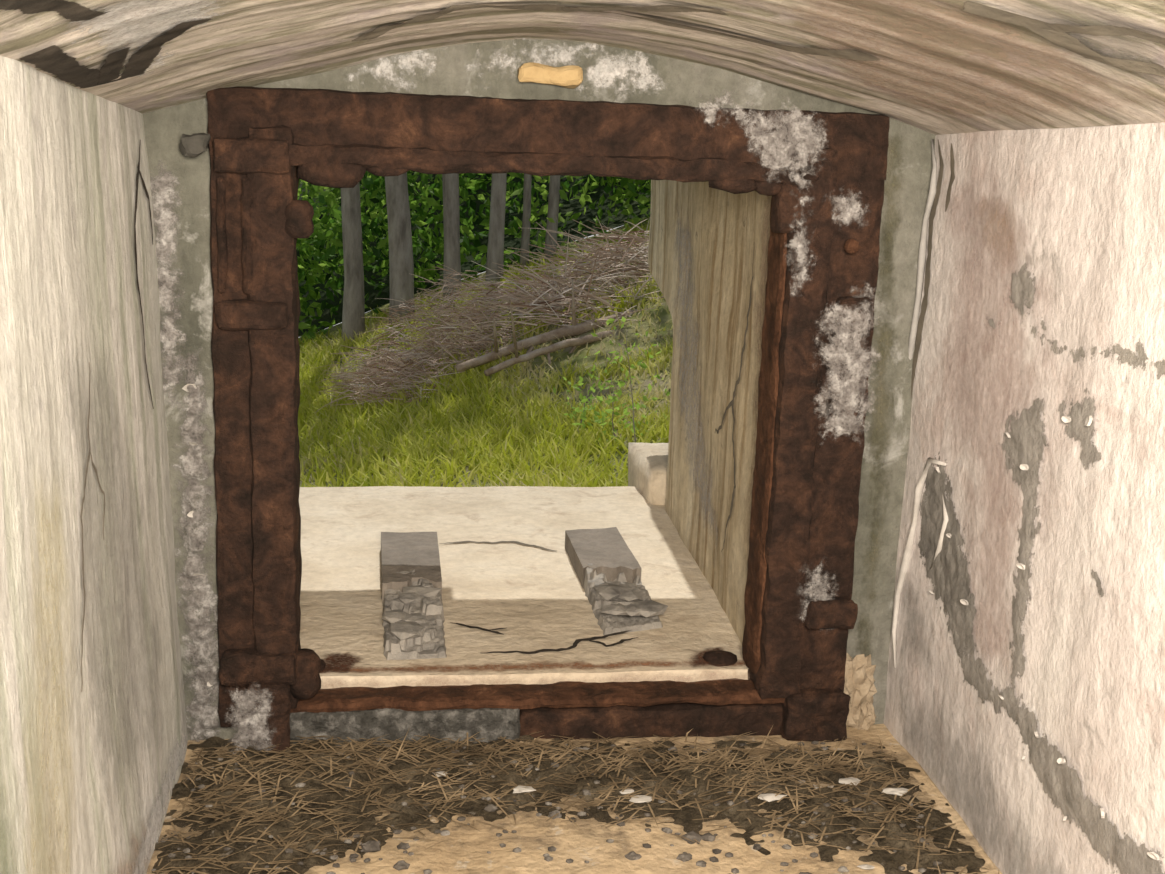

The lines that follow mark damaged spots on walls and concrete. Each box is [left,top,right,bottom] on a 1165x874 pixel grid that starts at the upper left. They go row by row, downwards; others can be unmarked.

water stain [350,50,434,78]
water stain [493,45,661,89]
spalling [1009,263,1036,314]
crack [1020,306,1165,379]
water stain [816,303,880,436]
rust [319,648,720,673]
crack [454,623,638,654]